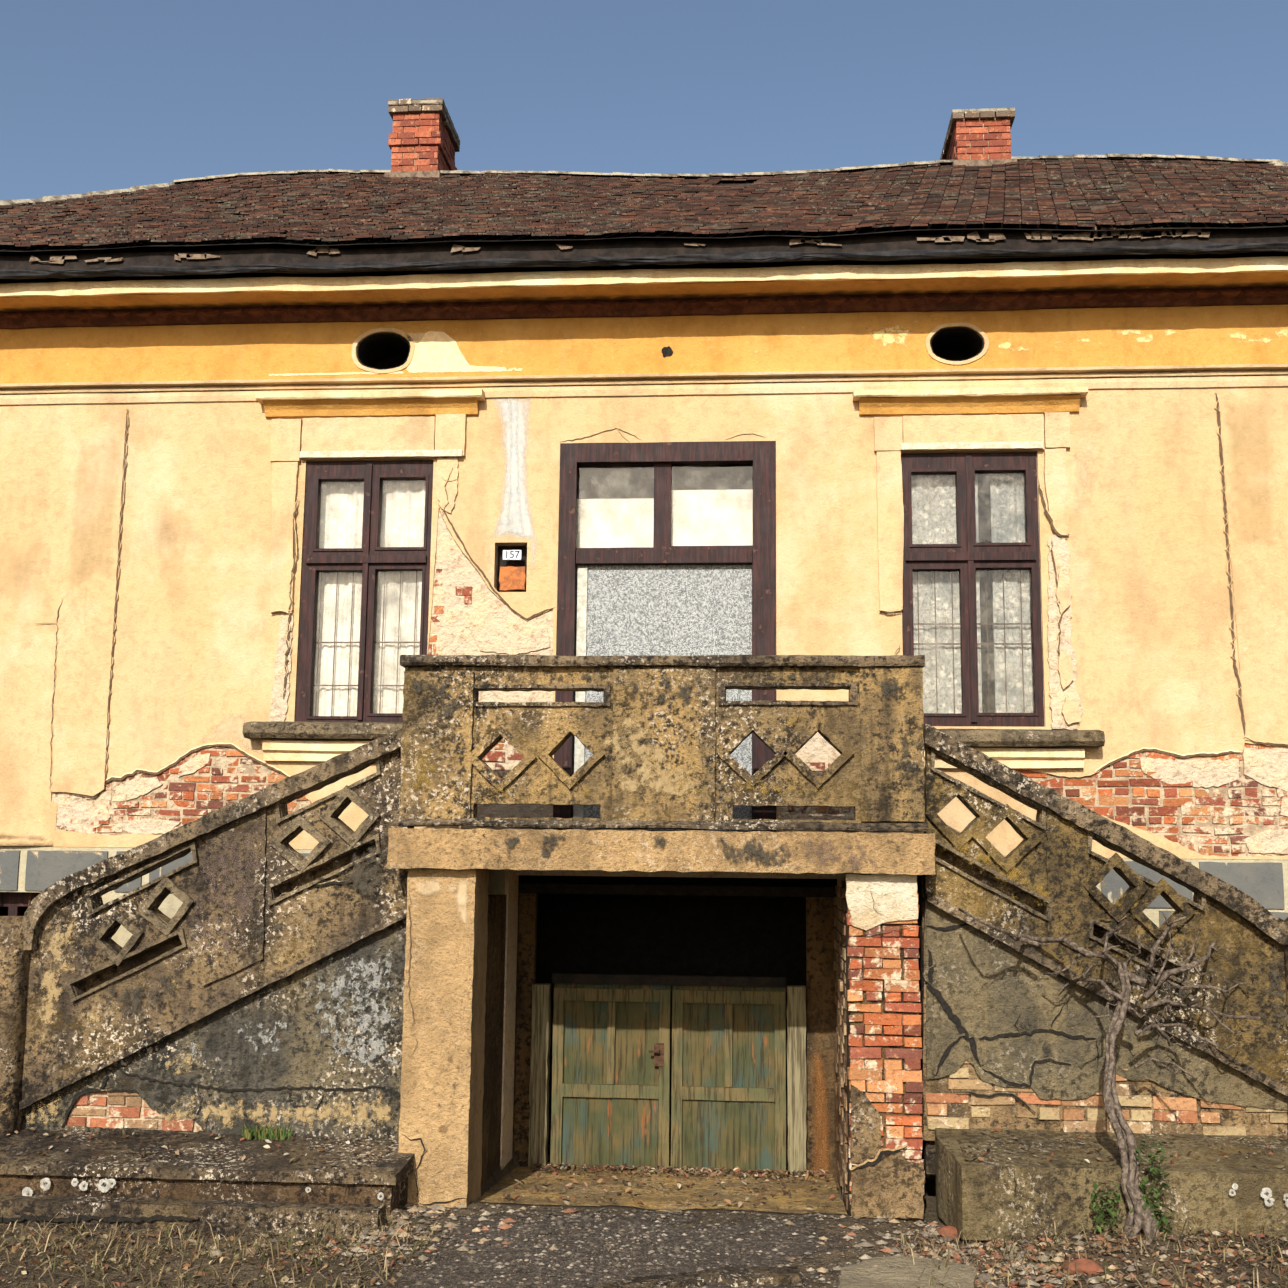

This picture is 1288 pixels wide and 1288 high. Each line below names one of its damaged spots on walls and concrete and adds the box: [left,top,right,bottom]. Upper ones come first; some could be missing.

crack [104,408,129,782]
peeling [427,504,555,656]
crack [1038,480,1068,687]
crack [1215,391,1288,746]
leakage [657,671,701,706]
spalling [51,716,290,835]
leakage [717,836,797,865]
spalling [1013,743,1288,860]
leakage [238,1017,287,1055]
leakage [306,950,402,1067]
crack [853,890,1106,1113]
spalling [846,894,1288,1204]